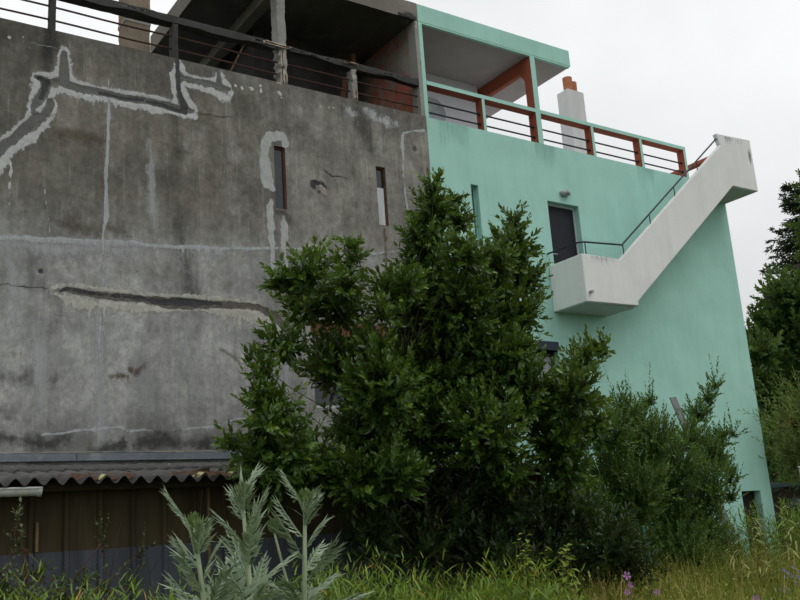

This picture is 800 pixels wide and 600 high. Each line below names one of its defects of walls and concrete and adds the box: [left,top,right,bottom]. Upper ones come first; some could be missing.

crack [0,42,234,176]
spalling [310,180,328,196]
crack [0,283,295,337]